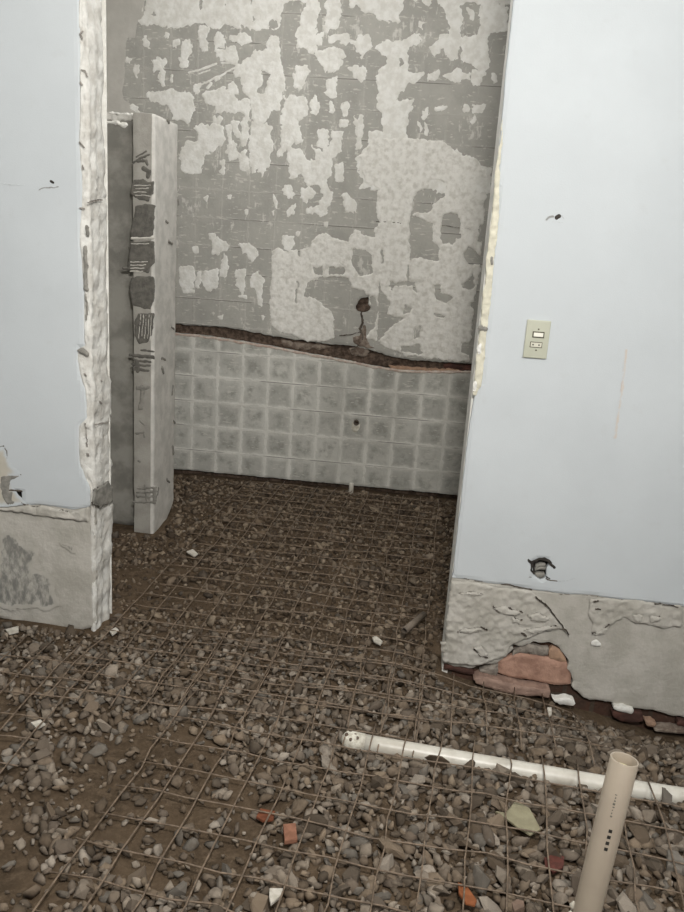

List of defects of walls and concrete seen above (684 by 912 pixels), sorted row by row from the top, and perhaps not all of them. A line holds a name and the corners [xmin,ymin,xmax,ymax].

peeling [138,0,511,396]
spalling [0,0,140,636]
peeling [443,557,575,717]
peeling [588,598,682,646]
spalling [610,703,684,734]